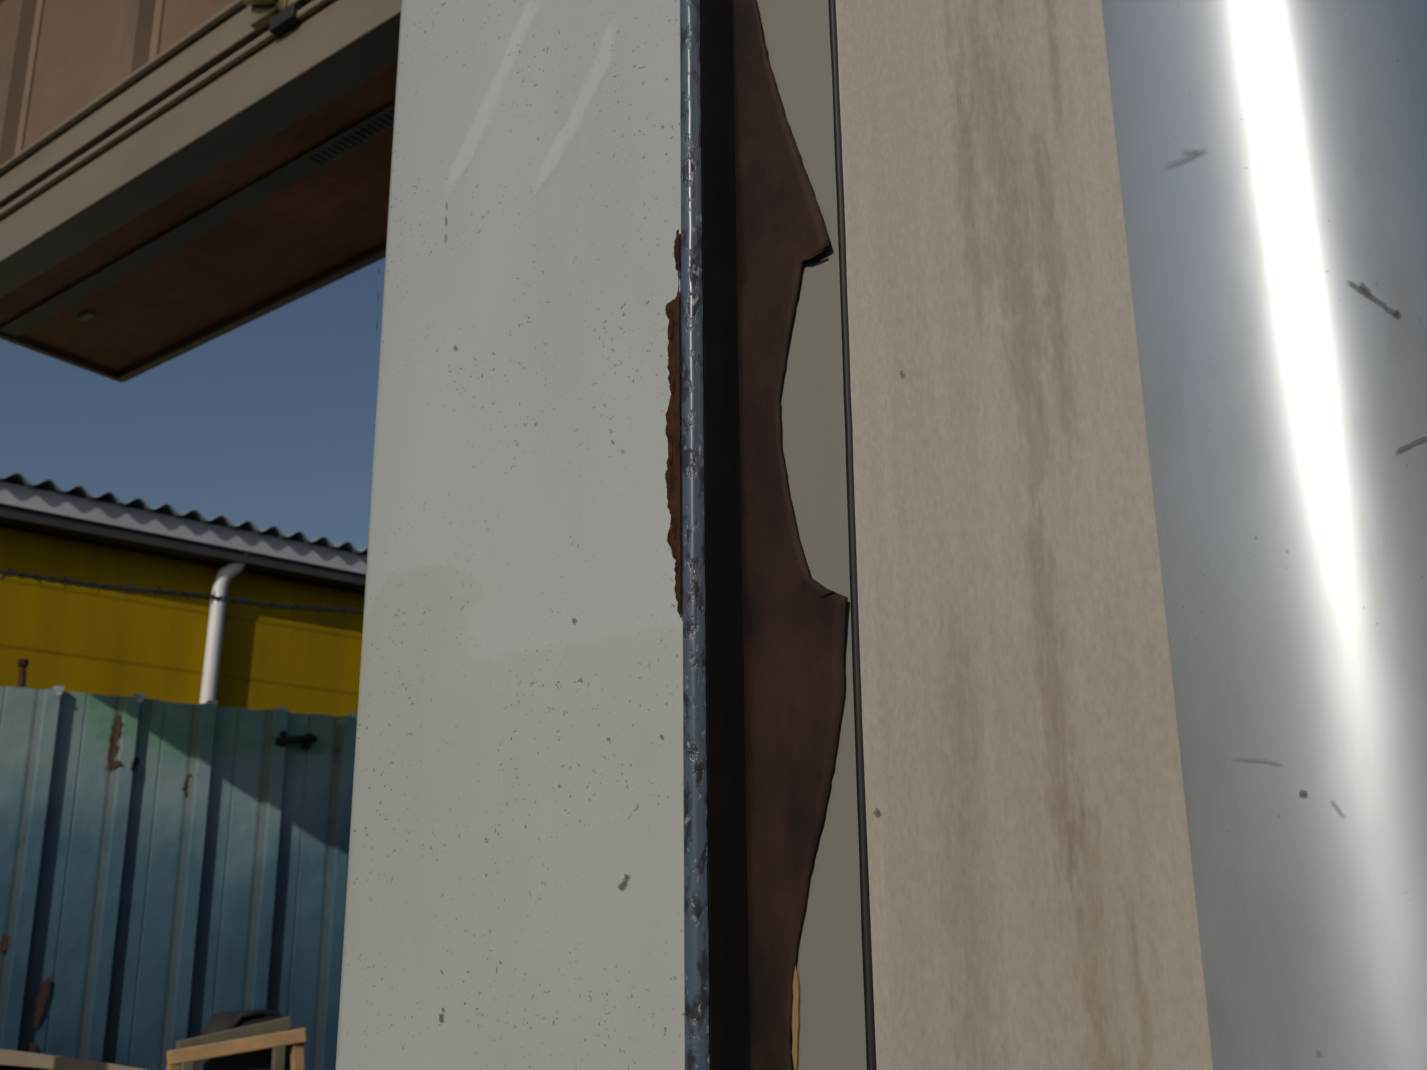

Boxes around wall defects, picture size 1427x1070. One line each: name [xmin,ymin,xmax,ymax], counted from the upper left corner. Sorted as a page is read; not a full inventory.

corrosion [105,713,139,772]